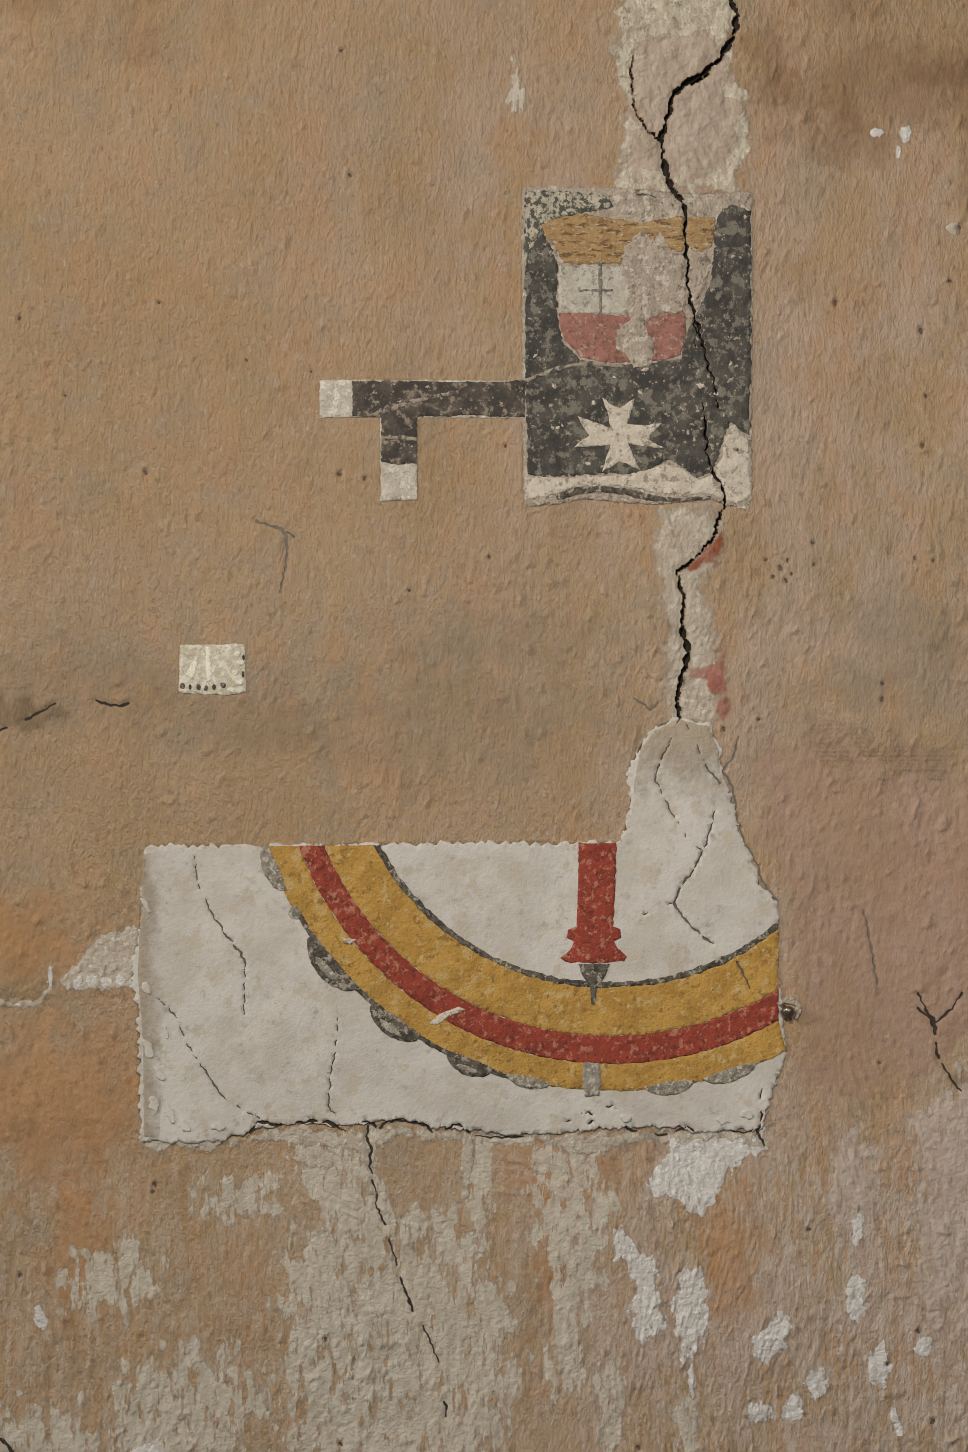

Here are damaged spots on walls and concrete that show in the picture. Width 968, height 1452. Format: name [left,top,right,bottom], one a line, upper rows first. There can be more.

flaking render [608,0,751,194]
crack [629,0,779,989]
flaking render [0,503,802,1452]
crack [917,991,963,1091]
crack [159,999,524,1362]
crack [567,1105,694,1136]
peeling [827,1120,881,1258]
peeling [906,1061,968,1357]
peeling [746,1367,830,1425]
peeling [845,1273,867,1324]
peeling [868,1339,893,1389]
peeling [890,1407,904,1437]